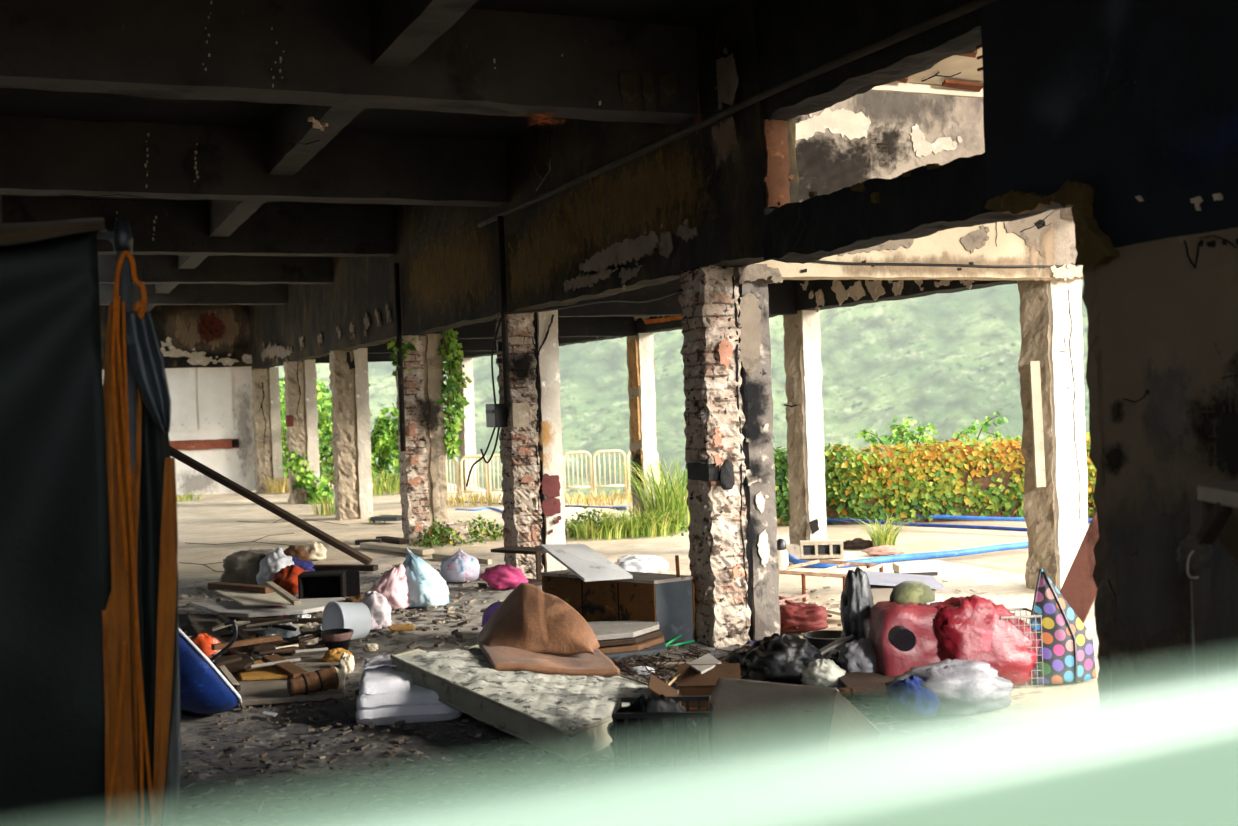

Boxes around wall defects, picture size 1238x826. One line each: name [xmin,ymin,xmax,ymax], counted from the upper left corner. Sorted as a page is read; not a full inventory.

spalling [942,44,983,92]
flaking render [762,108,871,208]
peeling [909,124,963,170]
peeling [563,219,698,292]
peeling [800,180,1120,312]
peeling [160,302,392,369]
peeling [716,264,783,377]
flaking render [711,426,723,467]
mould [1193,354,1238,481]
peeling [521,474,562,541]
flaking render [728,564,745,580]